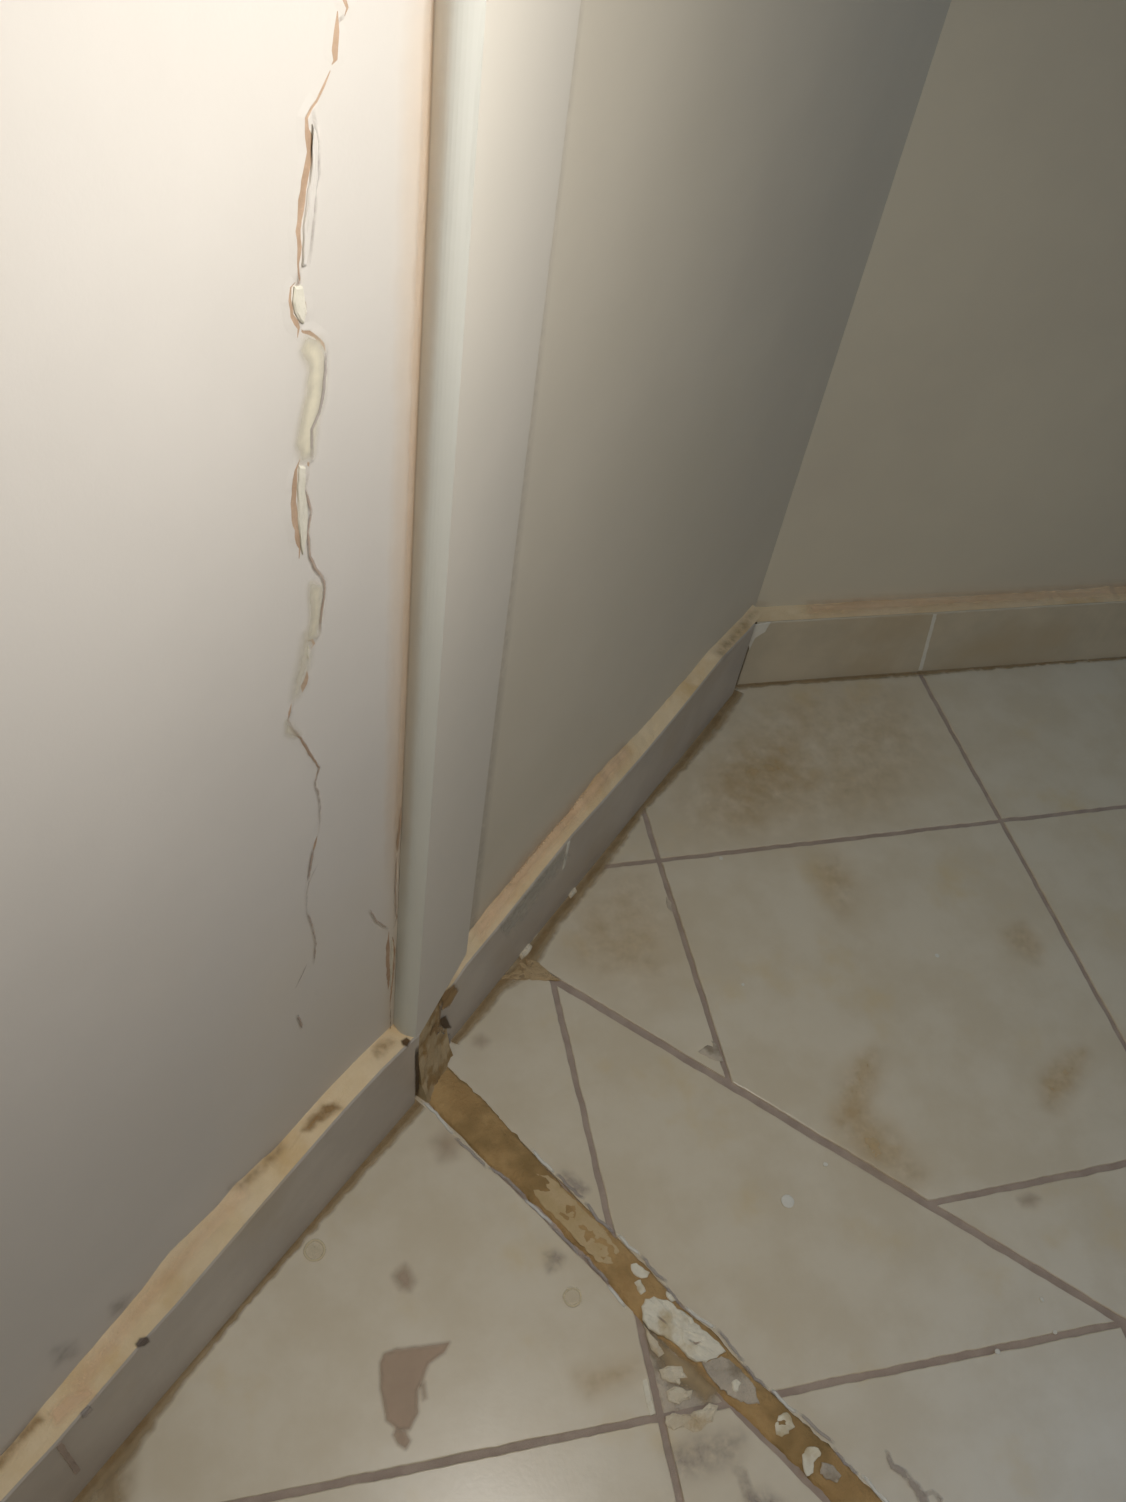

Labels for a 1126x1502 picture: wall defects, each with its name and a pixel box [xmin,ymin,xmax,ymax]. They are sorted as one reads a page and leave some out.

crack [280,0,356,795]
crack [308,834,322,876]
spalling [426,1104,623,1305]
spalling [534,1152,888,1502]